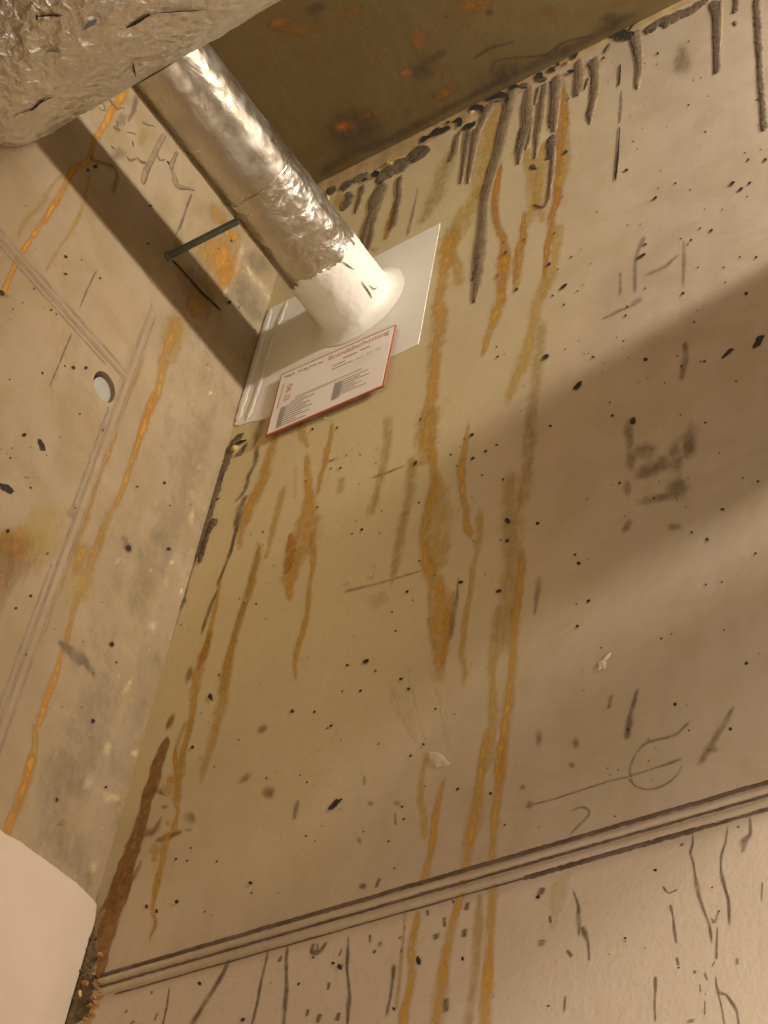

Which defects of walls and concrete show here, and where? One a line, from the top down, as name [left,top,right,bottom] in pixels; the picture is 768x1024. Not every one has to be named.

rust [2,90,127,293]
rust [188,205,238,317]
rust [409,78,568,669]
rust [18,319,180,796]
rust [95,579,221,979]
crack [176,444,238,622]
rust [203,548,260,770]
rust [284,426,333,675]
rust [418,782,444,893]
rust [433,479,524,1024]
spalling [66,925,103,1024]
rust [398,913,420,1024]